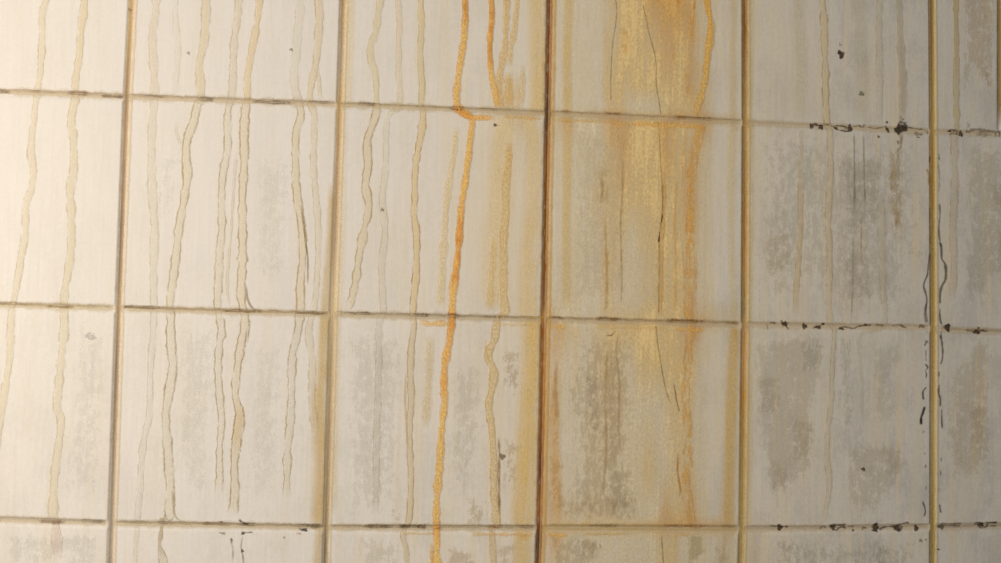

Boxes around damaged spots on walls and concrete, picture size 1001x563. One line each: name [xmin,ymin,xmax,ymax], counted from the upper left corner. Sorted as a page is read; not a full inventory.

water stain [165,133,191,354]
water stain [214,0,261,505]
water stain [288,182,308,379]
water stain [361,110,378,223]
water stain [406,109,426,465]
corrosion [425,0,518,563]
corrosion [477,0,752,563]
water stain [810,0,861,147]
water stain [802,196,884,330]
water stain [877,119,922,142]
crack [920,157,947,427]
water stain [824,522,926,542]